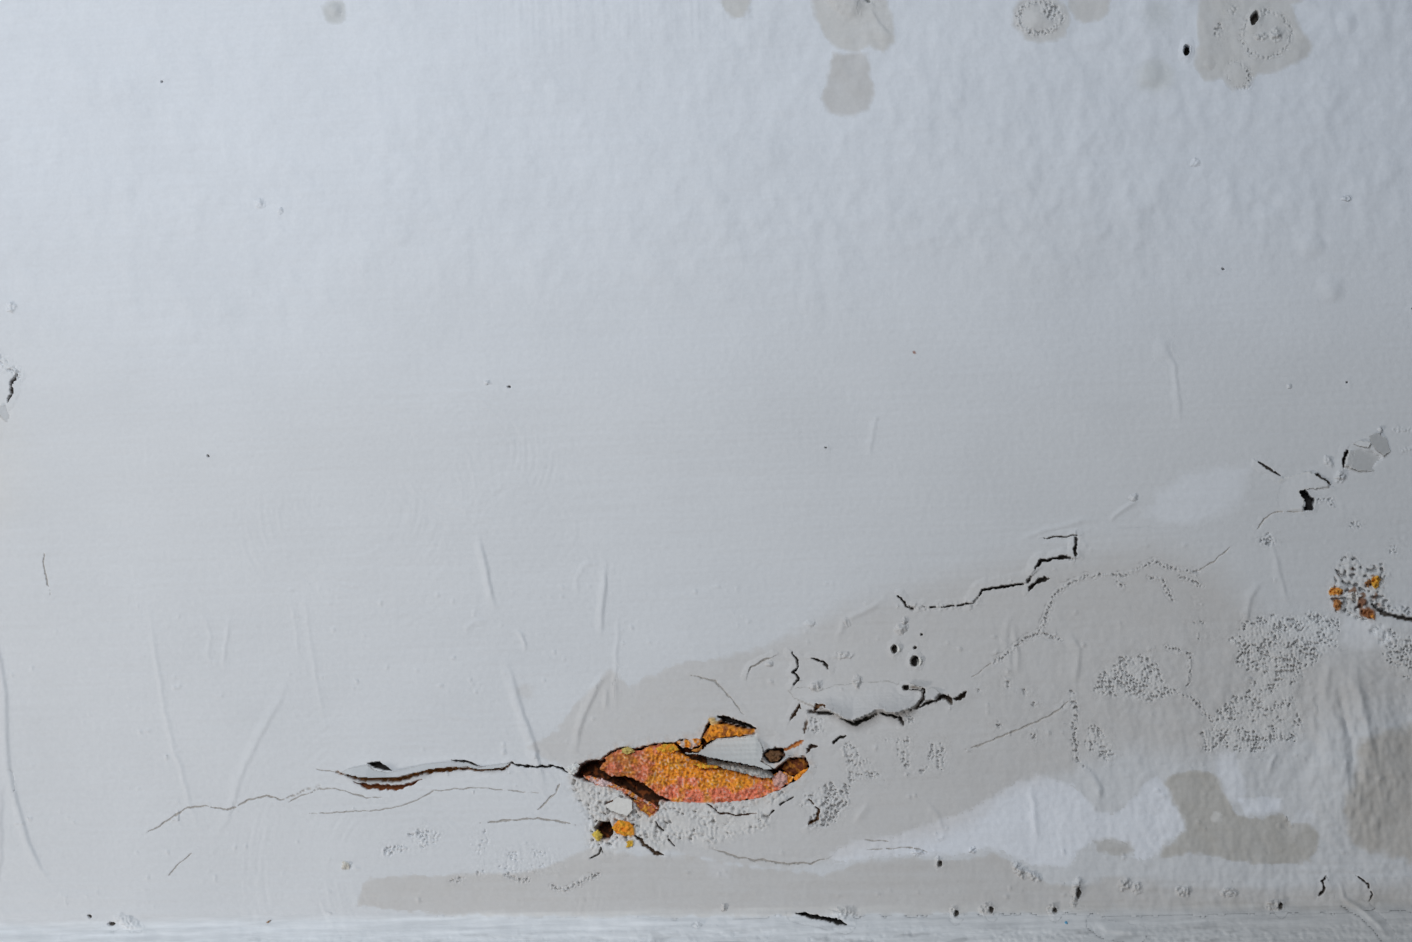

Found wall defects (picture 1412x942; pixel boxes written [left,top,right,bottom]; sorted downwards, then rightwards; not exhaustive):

leakage [719,0,752,20]
leakage [810,0,886,120]
crack [0,370,27,440]
peeling [1323,424,1412,484]
crack [684,527,1236,757]
crack [133,752,582,885]
flaking render [562,707,954,867]
leakage [357,804,1412,920]
spalling [932,852,948,875]
leakage [1159,768,1318,866]